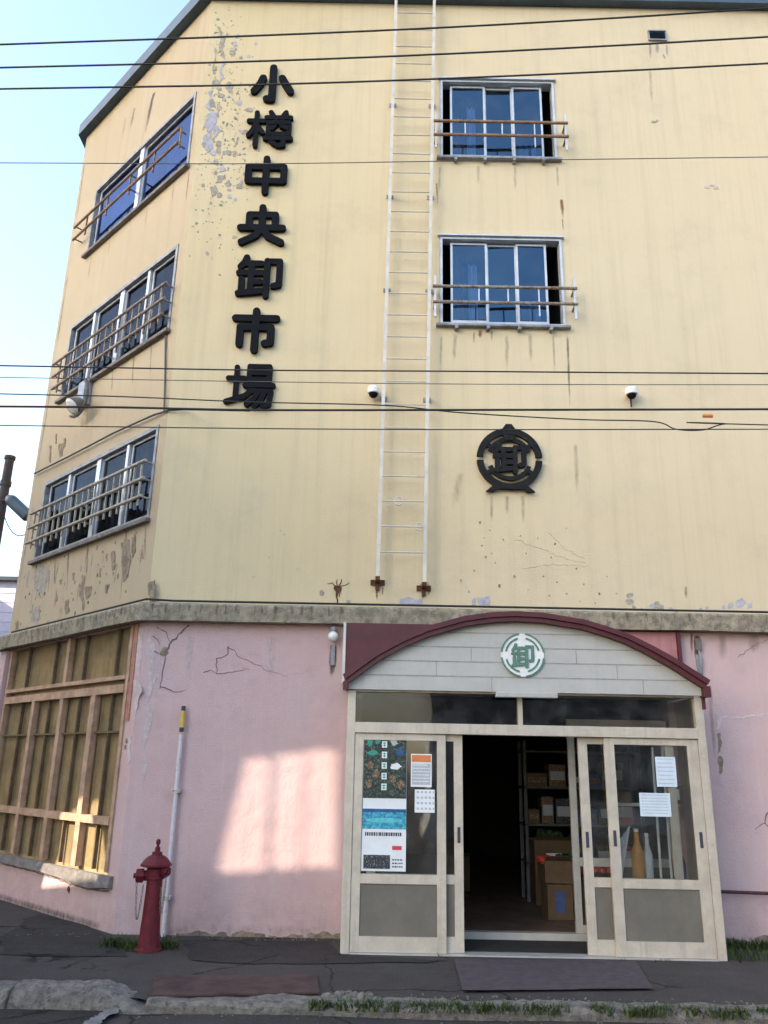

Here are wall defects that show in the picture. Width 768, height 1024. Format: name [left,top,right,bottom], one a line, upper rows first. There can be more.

peeling [192,7,261,260]
peeling [15,530,144,630]
rust [319,579,351,603]
crack [153,625,189,692]
crack [203,646,283,676]